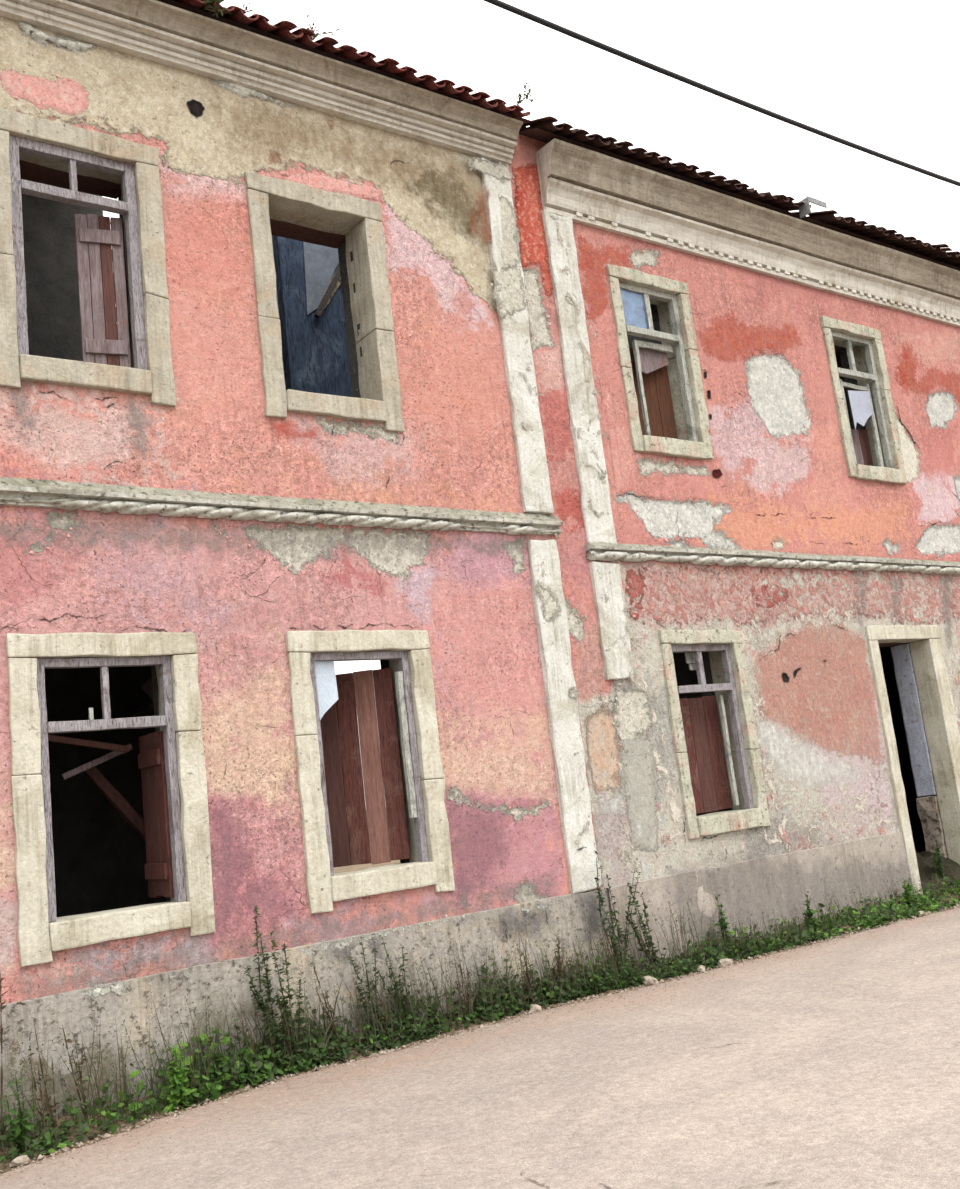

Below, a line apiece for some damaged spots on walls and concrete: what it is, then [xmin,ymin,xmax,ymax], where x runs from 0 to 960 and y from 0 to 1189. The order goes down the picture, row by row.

peeling [0,16,600,430]
peeling [744,351,812,439]
peeling [926,390,959,429]
peeling [574,414,613,483]
peeling [636,457,723,478]
peeling [895,410,922,485]
peeling [214,521,432,581]
peeling [589,490,741,549]
peeling [882,536,901,556]
peeling [916,522,960,558]
spalling [501,537,588,642]
peeling [574,562,960,869]